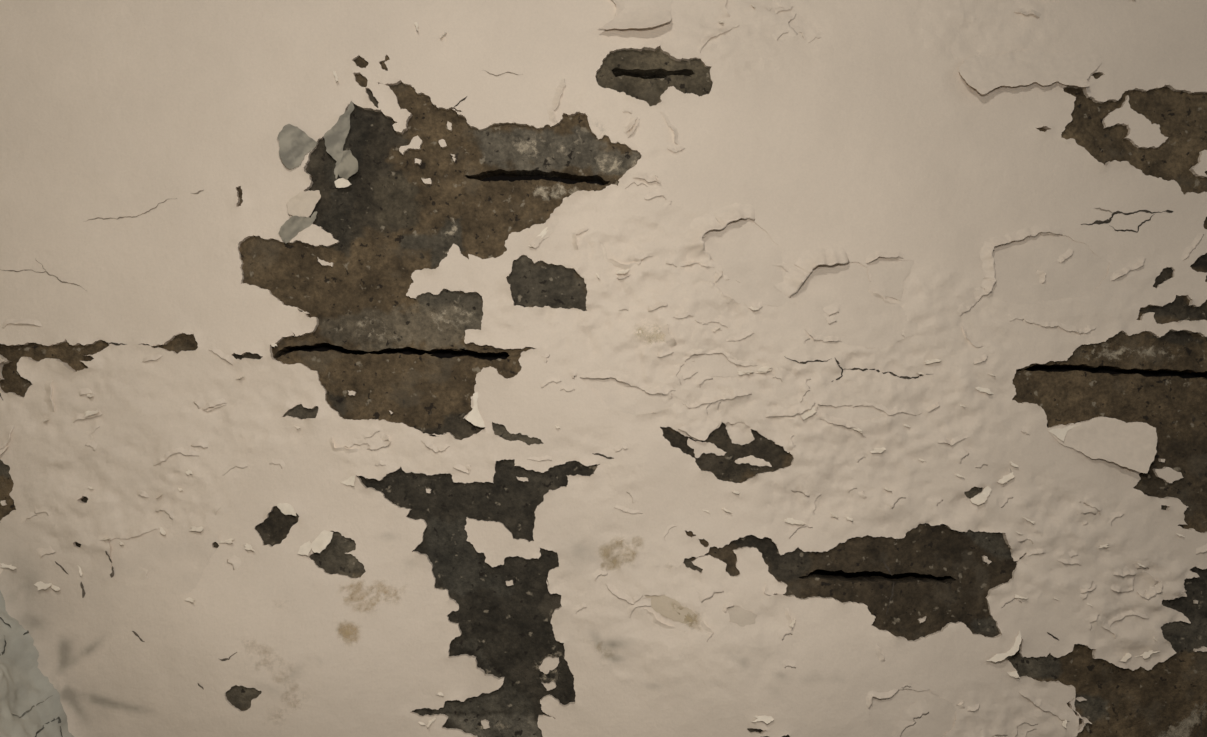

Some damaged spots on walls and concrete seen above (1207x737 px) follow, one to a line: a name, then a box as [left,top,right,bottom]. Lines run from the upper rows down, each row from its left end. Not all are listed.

peeling [958,50,1207,194]
crack [480,175,603,185]
peeling [0,340,109,422]
crack [285,344,510,361]
spalling [142,0,940,737]
crack [1024,365,1207,378]
spalling [0,425,56,524]
spalling [957,224,1207,737]
crack [55,551,114,598]
spalling [590,480,1081,663]
crack [810,569,942,579]
crack [11,695,63,737]